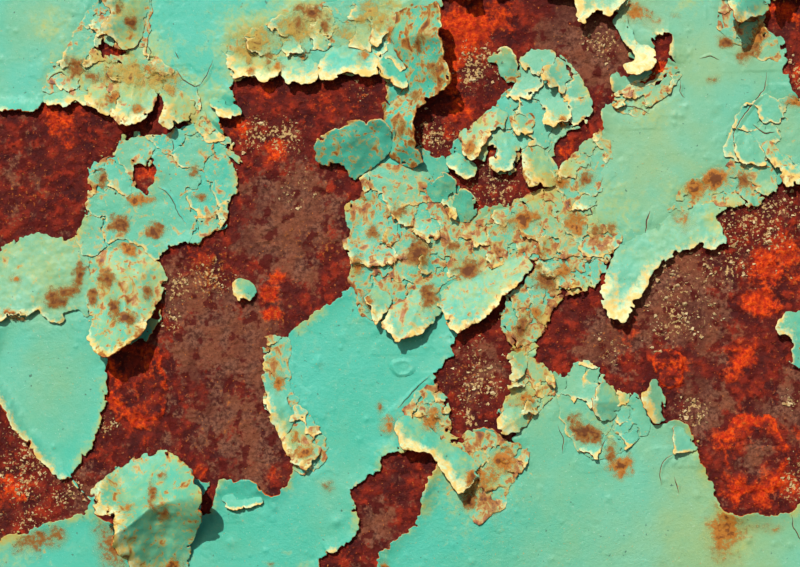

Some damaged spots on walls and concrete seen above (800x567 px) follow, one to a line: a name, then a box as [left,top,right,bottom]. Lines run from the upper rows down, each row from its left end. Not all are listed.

corrosion [509,111,535,136]
corrosion [687,167,727,201]
crack [158,185,187,223]
corrosion [564,214,587,235]
corrosion [44,261,88,308]
corrosion [107,299,137,324]
corrosion [567,413,602,444]
corrosion [295,446,315,458]
corrosion [605,446,633,479]
corrosion [221,493,263,511]
corrosion [16,525,65,551]
corrosion [705,512,747,559]